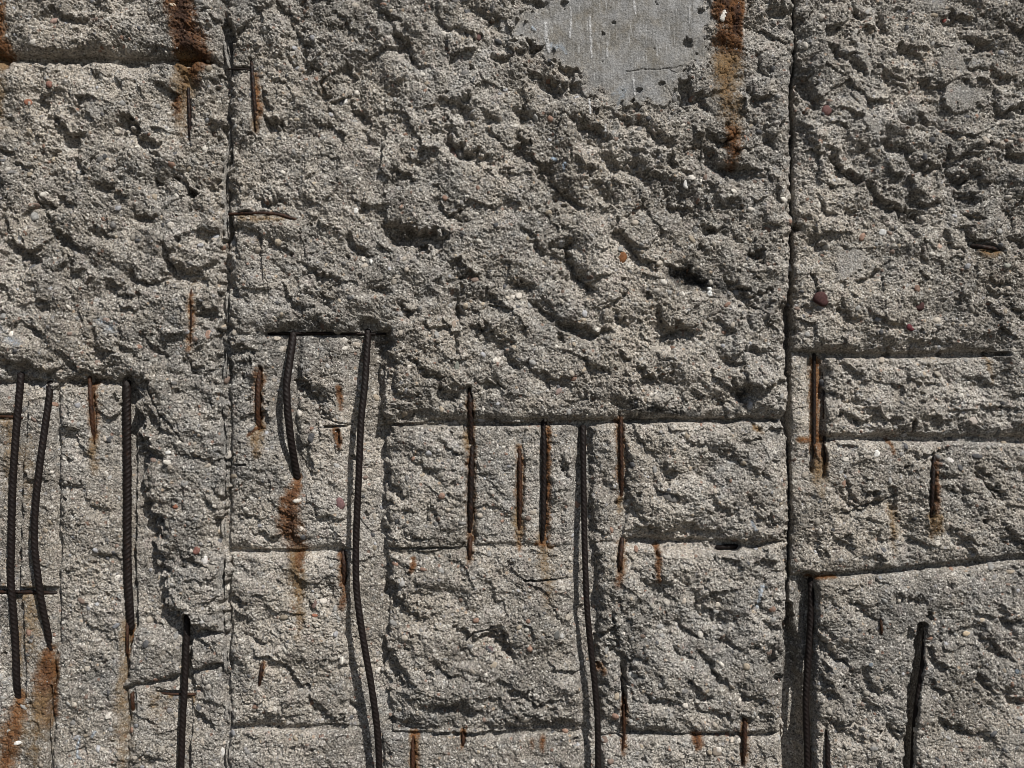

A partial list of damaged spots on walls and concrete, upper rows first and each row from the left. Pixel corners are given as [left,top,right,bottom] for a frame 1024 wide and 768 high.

rust [163,0,212,135]
rust [711,0,745,172]
spalling [548,249,611,350]
spalling [0,372,58,699]
rust [0,586,60,768]
spalling [122,380,135,654]
spalling [160,615,196,768]
rust [276,473,308,629]
spalling [268,328,387,768]
spalling [580,425,601,768]
rust [614,416,625,511]
rust [797,357,827,482]